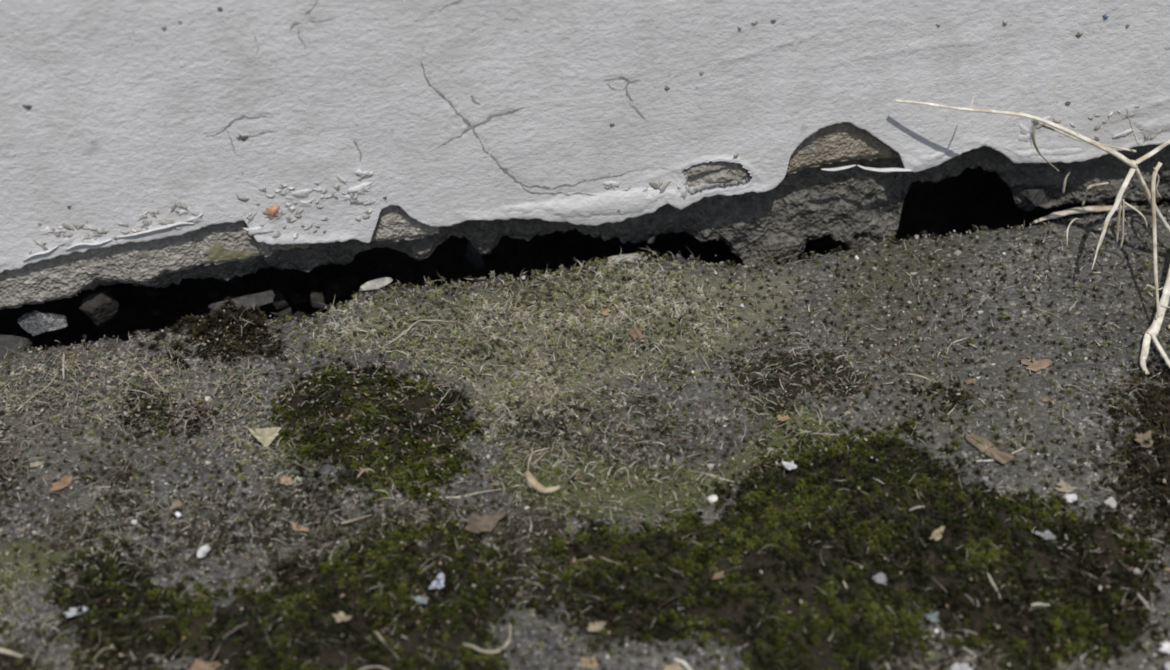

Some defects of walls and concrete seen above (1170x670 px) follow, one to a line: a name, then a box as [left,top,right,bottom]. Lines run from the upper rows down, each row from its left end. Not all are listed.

crack [421,62,674,196]
spalling [786,122,912,175]
peeling [1088,105,1166,142]
peeling [603,180,690,201]
spalling [0,168,439,308]